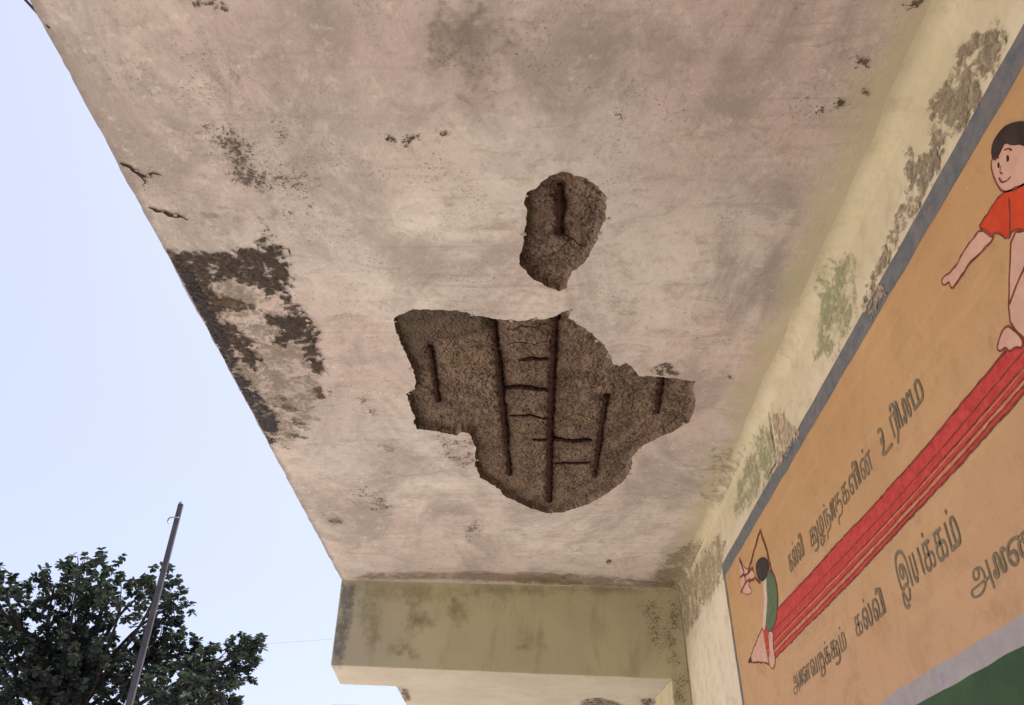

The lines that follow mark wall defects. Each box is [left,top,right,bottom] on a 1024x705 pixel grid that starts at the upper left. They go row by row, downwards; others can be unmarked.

crack [120,163,187,220]
damp [197,118,315,220]
spalling [519,172,610,291]
damp [166,217,336,448]
spalling [394,309,696,515]
damp [333,586,353,655]
damp [362,572,675,588]
damp [638,600,688,702]